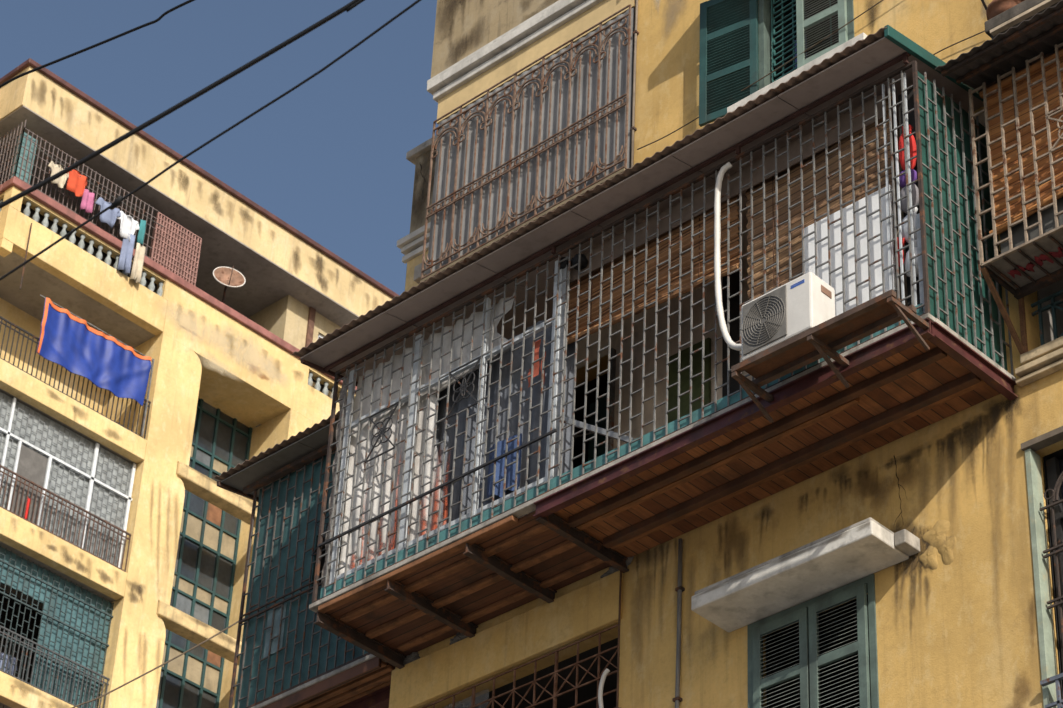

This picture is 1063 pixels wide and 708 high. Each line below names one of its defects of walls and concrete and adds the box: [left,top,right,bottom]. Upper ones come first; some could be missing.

damp [937,399,1017,457]
damp [893,524,928,589]